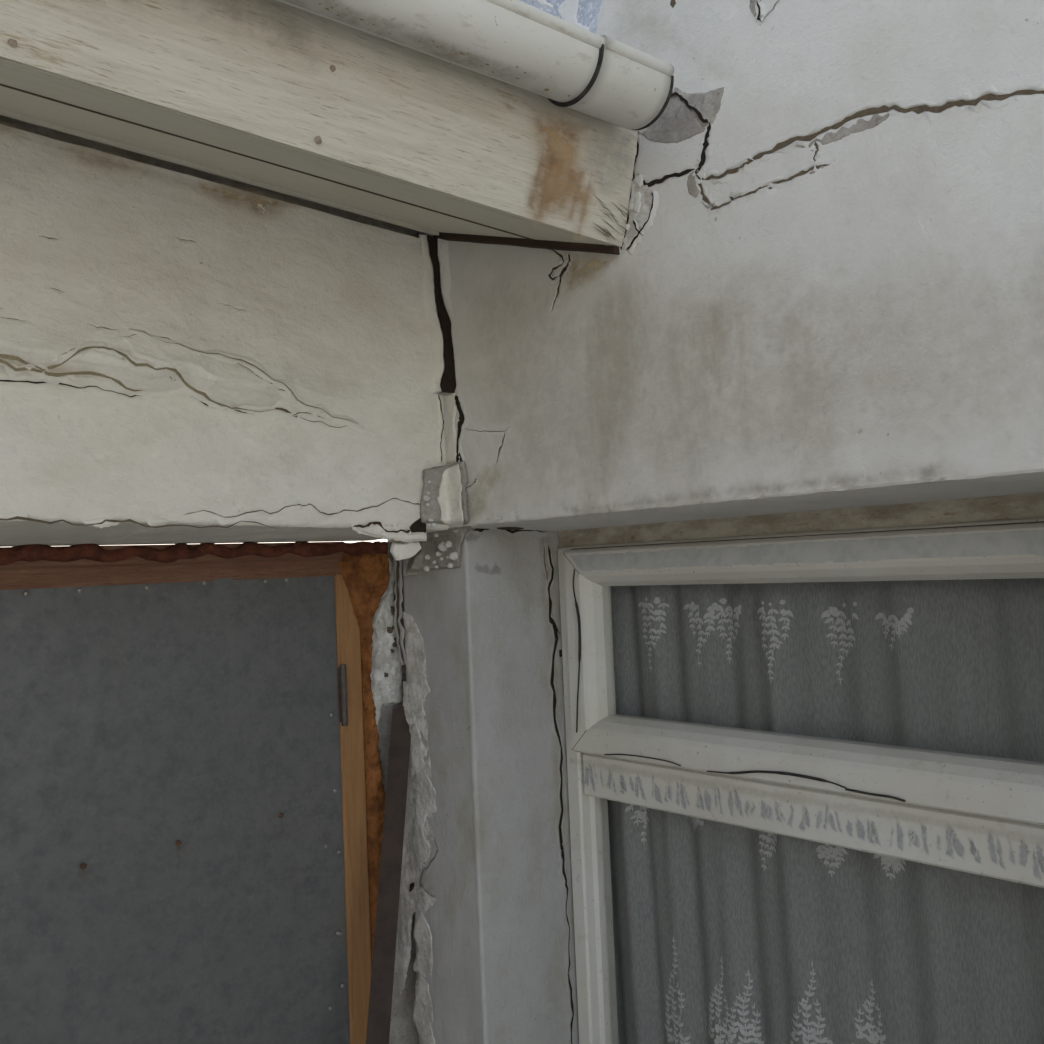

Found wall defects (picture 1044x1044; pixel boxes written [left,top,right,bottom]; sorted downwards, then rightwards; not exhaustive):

peeling [520,0,602,33]
rust [530,123,584,217]
spalling [638,87,725,143]
crack [619,81,1044,252]
crack [419,235,512,493]
crack [546,249,575,313]
spalling [351,392,475,1044]
crack [465,527,575,1044]